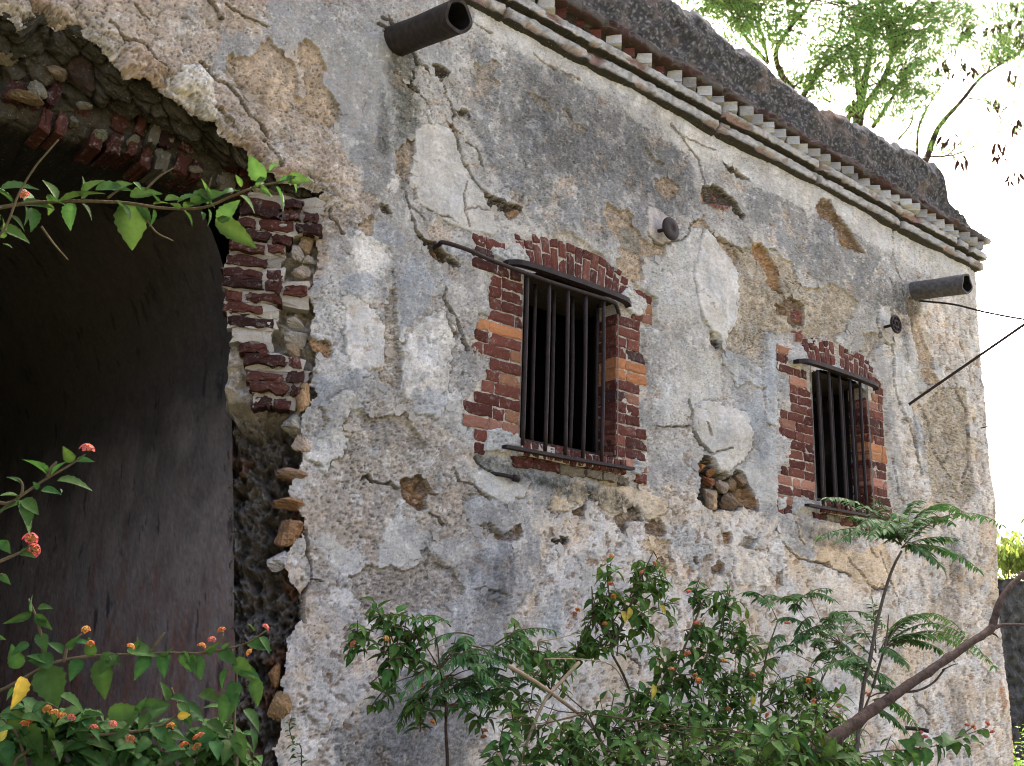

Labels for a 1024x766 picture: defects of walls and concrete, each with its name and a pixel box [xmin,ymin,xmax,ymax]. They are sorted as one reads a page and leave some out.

spalling [225,37,348,132]
crack [405,52,522,239]
spalling [603,146,976,516]
spalling [348,458,532,628]
crack [781,521,900,606]